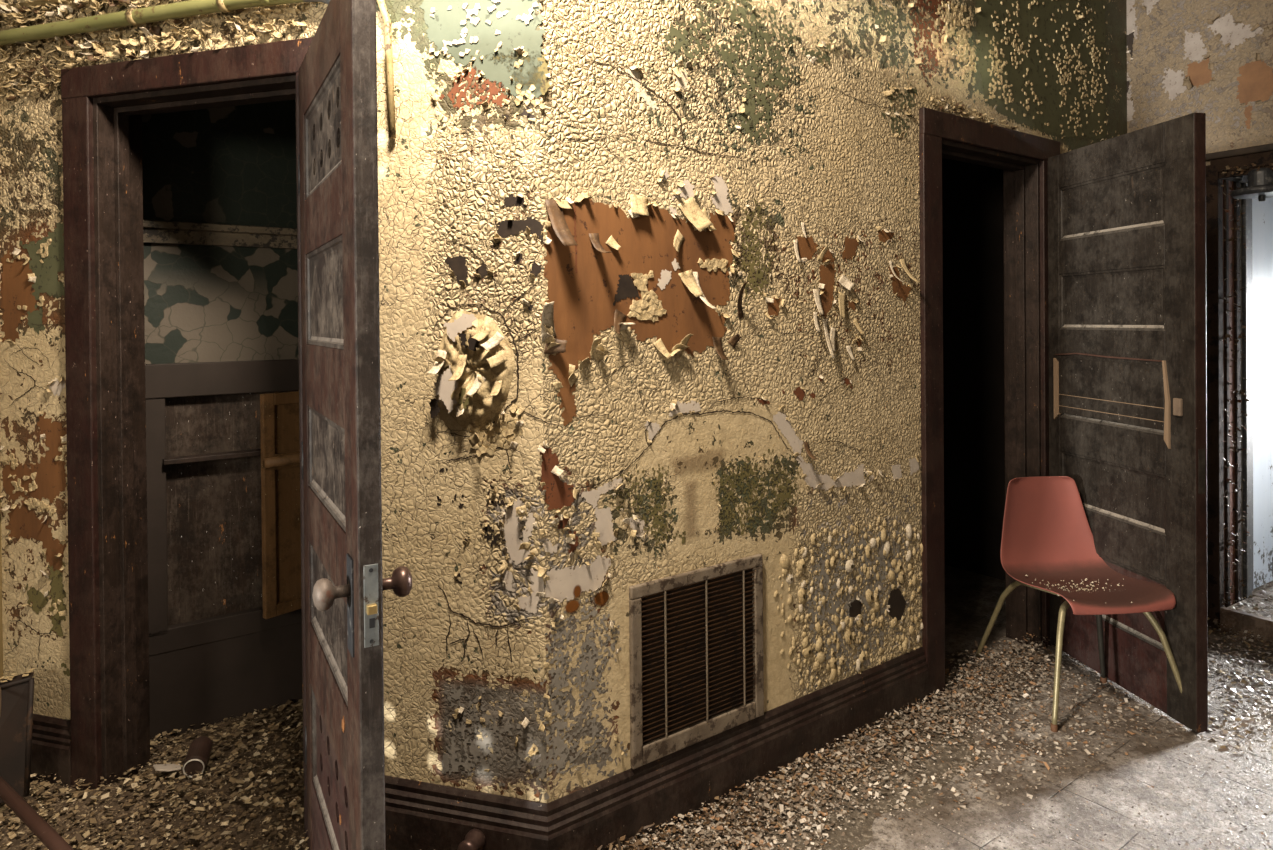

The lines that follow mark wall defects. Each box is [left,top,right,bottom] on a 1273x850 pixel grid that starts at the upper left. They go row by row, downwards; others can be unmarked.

peeling [0,0,308,101]
peeling [664,0,837,145]
peeling [868,0,1109,141]
flaking render [1126,0,1160,121]
peeling [1162,13,1269,101]
peeling [0,223,65,366]
peeling [445,255,493,288]
peeling [492,169,785,426]
crack [434,239,913,489]
peeling [793,222,894,360]
peeling [0,411,67,637]
peeling [712,374,920,537]